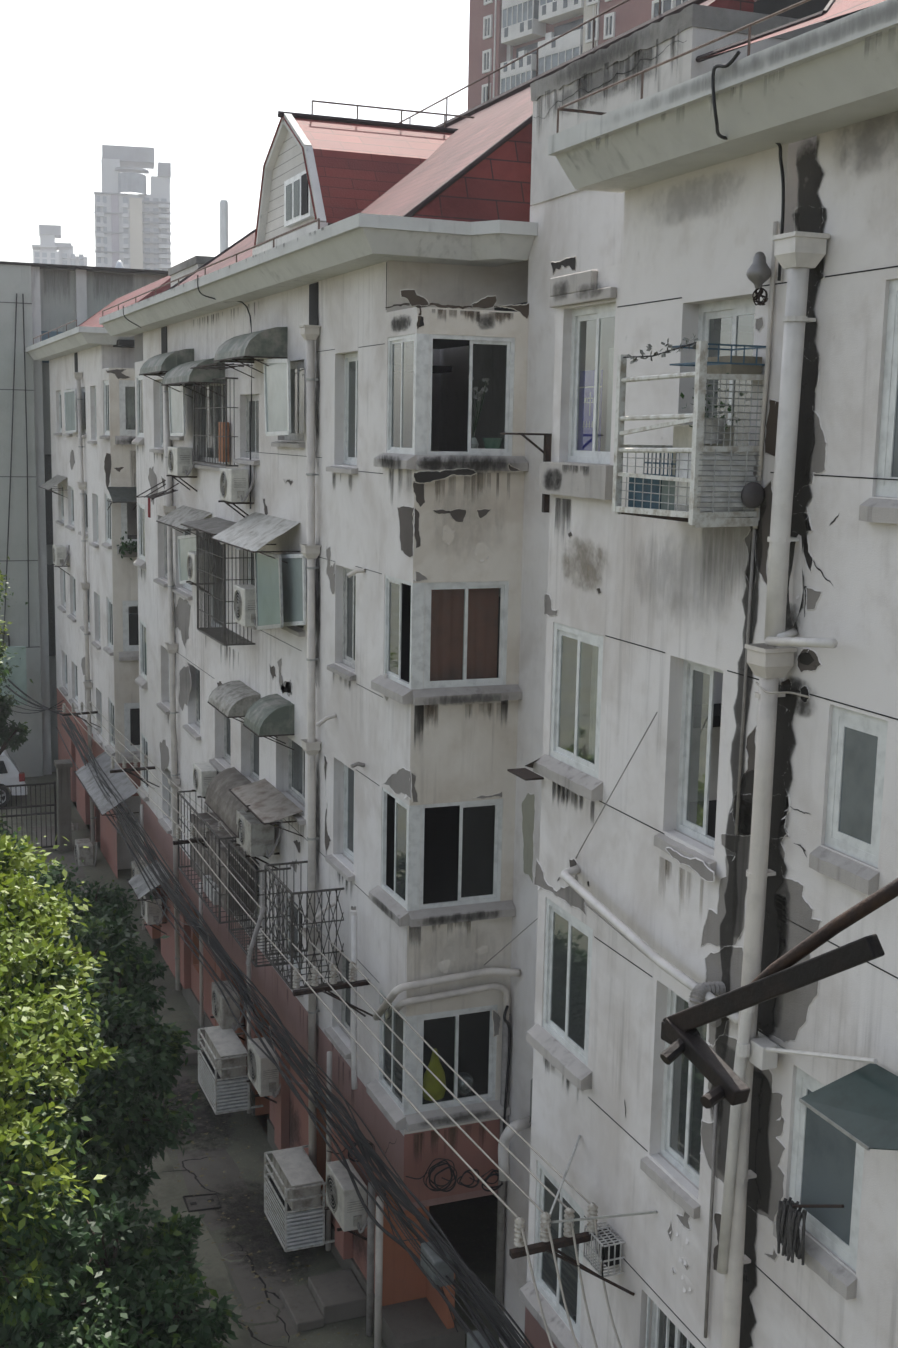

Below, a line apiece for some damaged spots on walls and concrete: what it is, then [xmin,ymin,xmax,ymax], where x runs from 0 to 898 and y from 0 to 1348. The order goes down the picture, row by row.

spalling [764,399,779,457]
water stain [379,455,400,469]
water stain [419,456,506,473]
spalling [795,350,828,611]
spalling [397,468,491,582]
spalling [744,480,773,585]
spalling [780,647,822,703]
spalling [383,767,419,803]
spalling [665,726,757,991]
spalling [775,772,822,966]
spalling [761,980,820,1043]